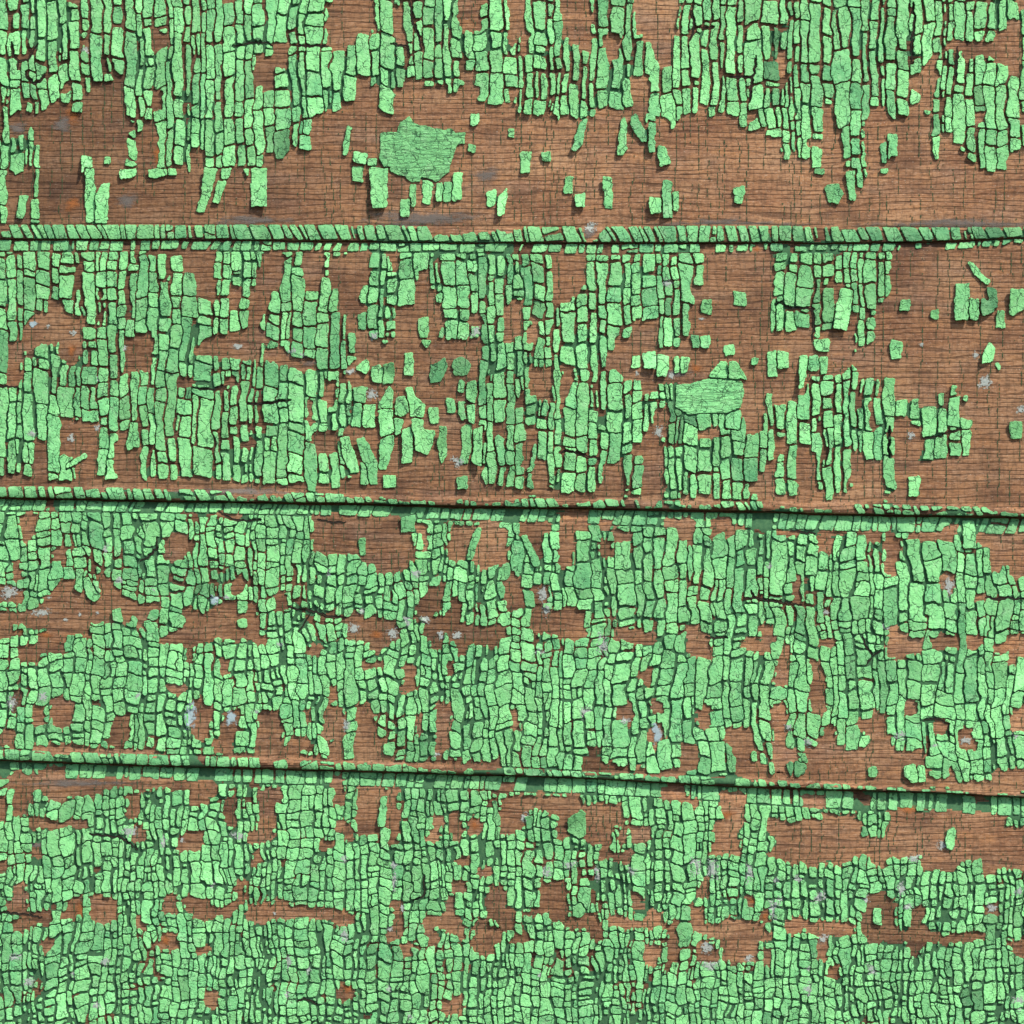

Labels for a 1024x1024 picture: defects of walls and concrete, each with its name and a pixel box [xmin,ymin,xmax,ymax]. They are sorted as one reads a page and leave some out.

crack [11,43,46,84]
crack [234,40,329,48]
crack [391,0,422,58]
crack [729,56,757,102]
crack [909,3,917,63]
peeling [0,0,1024,645]
crack [775,301,815,341]
peeling [0,544,271,666]
peeling [413,584,510,676]
peeling [0,688,241,860]
peeling [707,621,1024,879]
peeling [420,811,986,980]